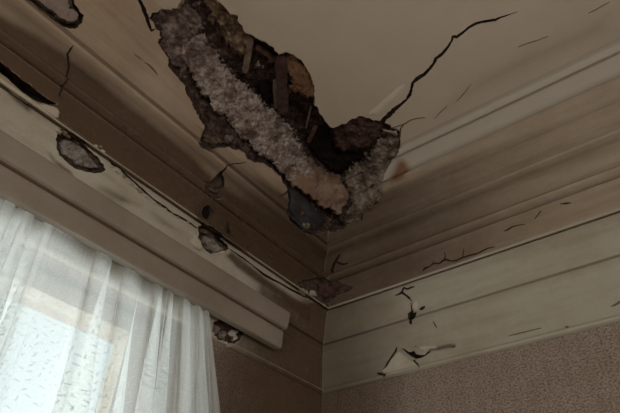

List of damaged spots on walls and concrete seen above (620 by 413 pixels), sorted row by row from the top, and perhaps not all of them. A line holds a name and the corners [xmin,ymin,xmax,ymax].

flaking render [28,0,80,29]
flaking render [0,69,60,119]
flaking render [151,0,400,235]
crack [379,11,518,134]
flaking render [54,128,179,219]
crack [109,160,197,228]
damp [0,18,415,413]
flaking render [189,206,229,255]
crack [230,249,307,298]
crack [422,247,494,271]
crack [395,286,425,312]
flaking render [212,319,243,347]